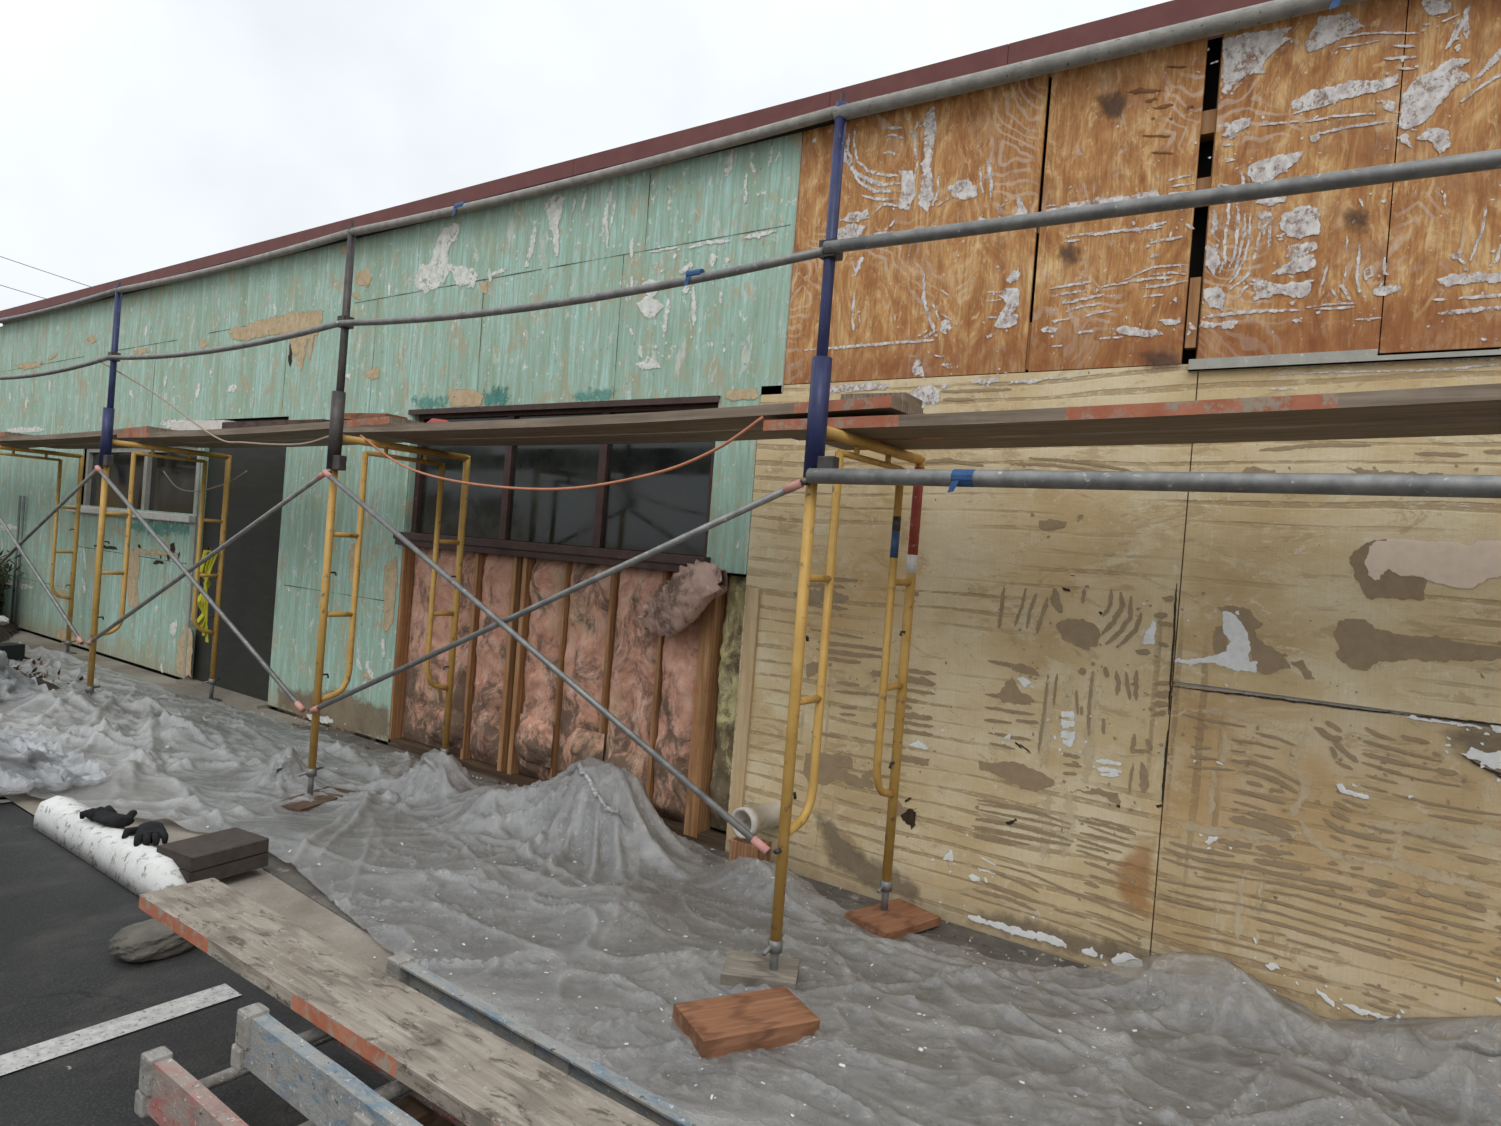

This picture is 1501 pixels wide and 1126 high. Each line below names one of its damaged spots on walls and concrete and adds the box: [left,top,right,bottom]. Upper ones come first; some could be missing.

peeling [821,106,1027,240]
peeling [1041,0,1501,347]
peeling [414,188,587,294]
peeling [228,295,323,371]
peeling [448,389,484,408]
peeling [626,230,776,381]
peeling [804,256,1081,408]
peeling [1270,337,1501,390]
peeling [1349,537,1501,601]
peeling [1174,592,1315,687]
peeling [1333,619,1501,679]
peeling [1431,716,1501,782]